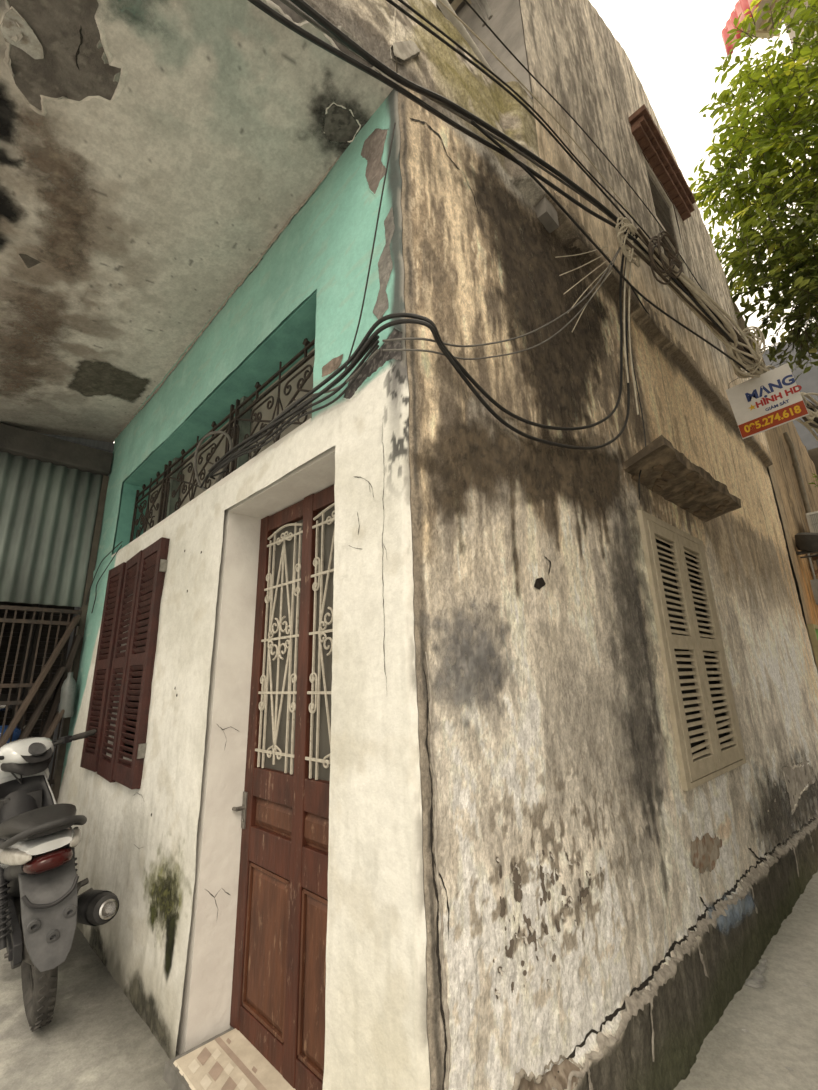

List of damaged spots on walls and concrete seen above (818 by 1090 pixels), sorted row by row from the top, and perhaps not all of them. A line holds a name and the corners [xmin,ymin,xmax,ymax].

flaking render [0,0,128,117]
leakage [0,85,91,273]
peeling [324,102,389,196]
peeling [372,204,396,320]
leakage [0,289,66,397]
peeling [321,353,344,378]
leakage [416,152,661,845]
flaking render [691,833,722,874]
crack [552,817,818,1090]
flaking render [512,1055,583,1090]